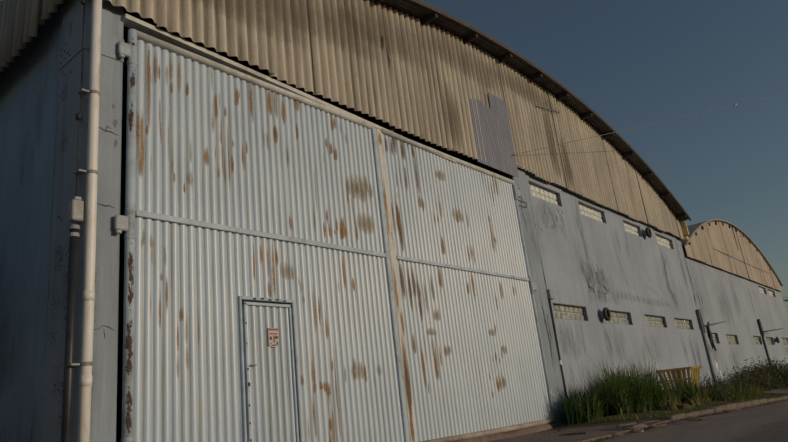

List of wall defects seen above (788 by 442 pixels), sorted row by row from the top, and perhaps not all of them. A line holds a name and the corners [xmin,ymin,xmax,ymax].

rust [136,51,160,173]
rust [204,95,248,180]
rust [267,92,285,147]
rust [379,126,424,210]
rust [324,213,346,239]
rust [384,187,404,250]
rust [253,245,278,296]
rust [394,269,442,332]
rust [301,361,346,442]
rust [403,338,446,441]